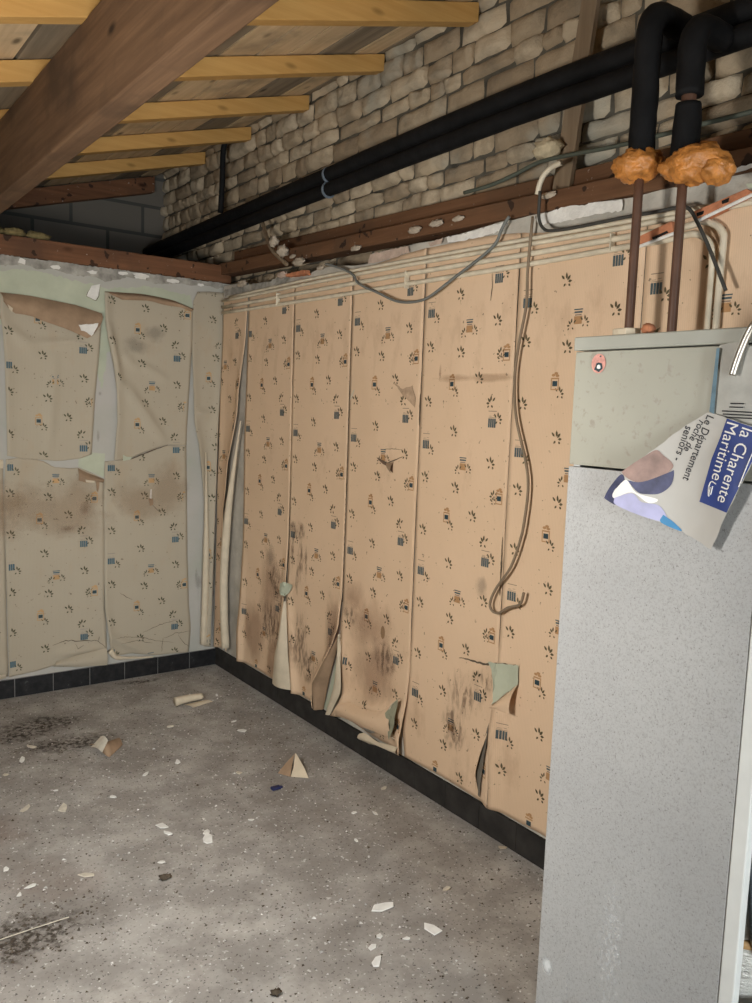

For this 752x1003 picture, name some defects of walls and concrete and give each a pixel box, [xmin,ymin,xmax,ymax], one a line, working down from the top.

spalling [368,246,409,264]
flaking render [0,254,289,388]
flaking render [78,453,105,477]
flaking render [488,662,519,705]